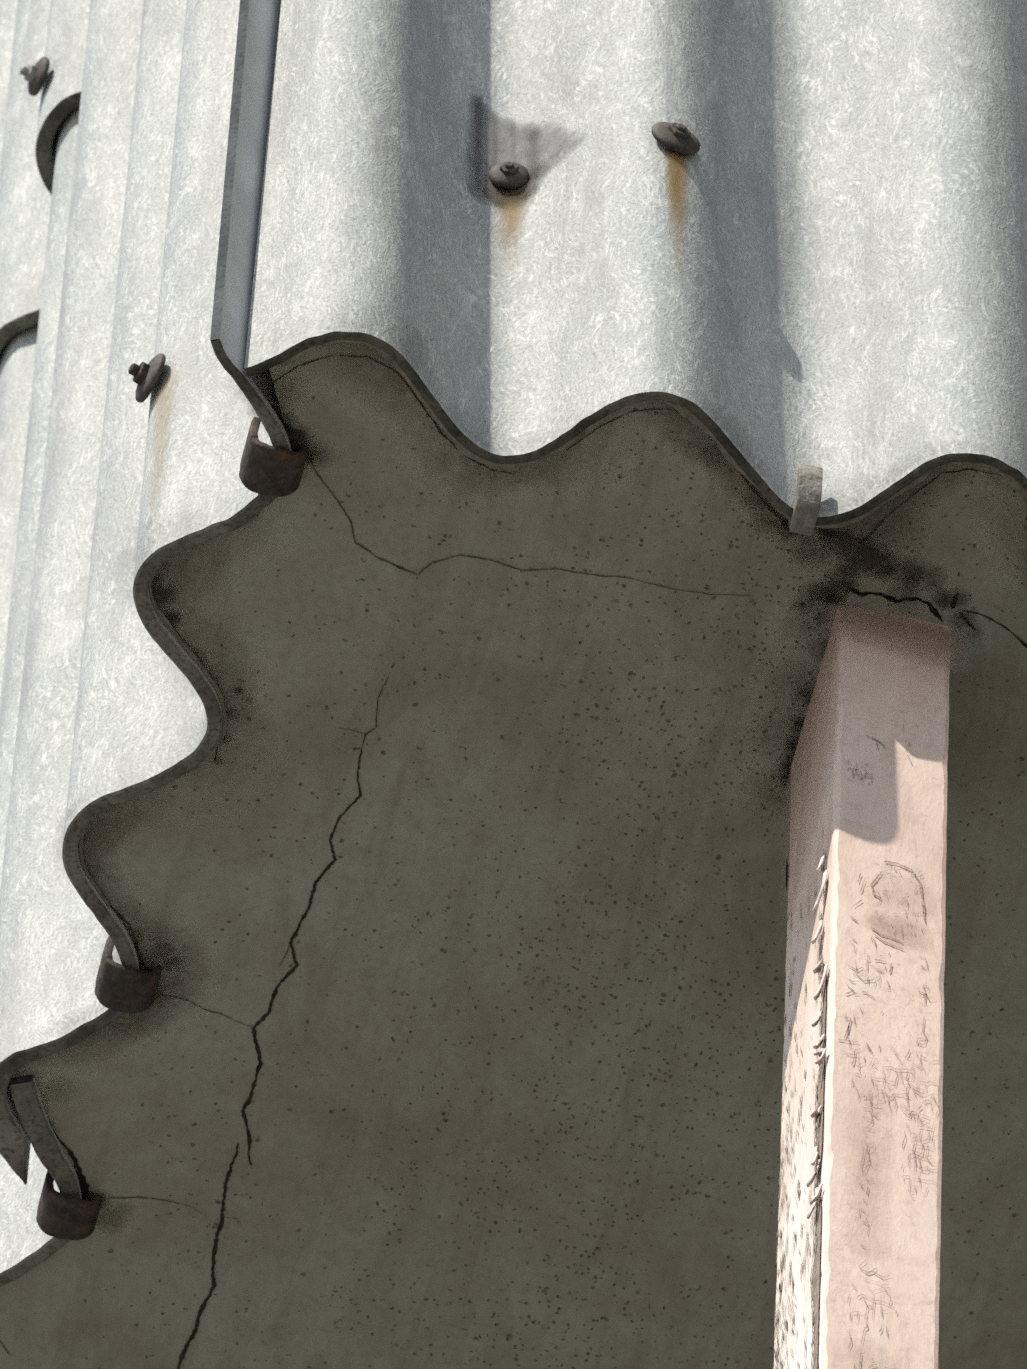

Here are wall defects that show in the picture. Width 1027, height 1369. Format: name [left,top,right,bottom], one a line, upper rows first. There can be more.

rust [670,151,685,215]
crack [309,454,752,596]
leakage [800,529,969,625]
crack [849,588,1027,648]
leakage [784,718,805,767]
crack [110,678,388,1369]